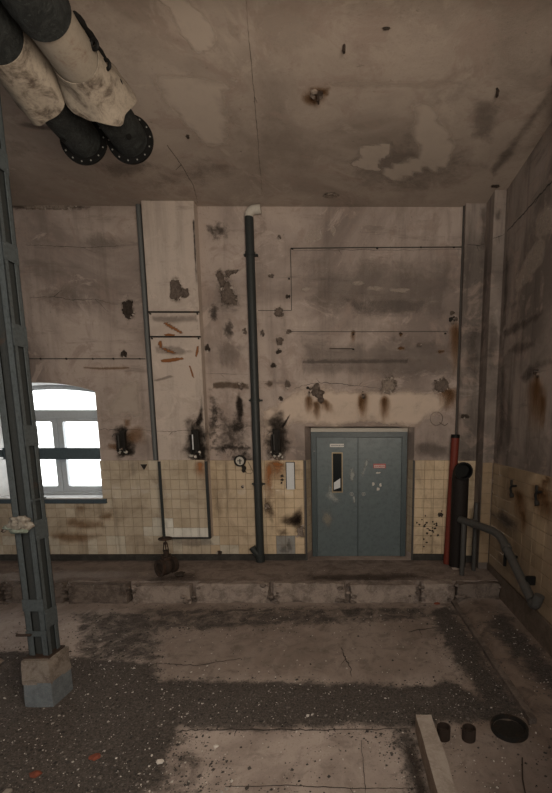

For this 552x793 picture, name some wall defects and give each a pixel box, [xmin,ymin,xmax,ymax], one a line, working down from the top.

peeling [352,104,454,180]
flaking render [169,278,189,301]
flaking render [215,269,238,305]
flaking render [122,300,135,319]
corrosion [306,397,329,414]
peeling [263,377,449,447]
crack [182,728,415,793]